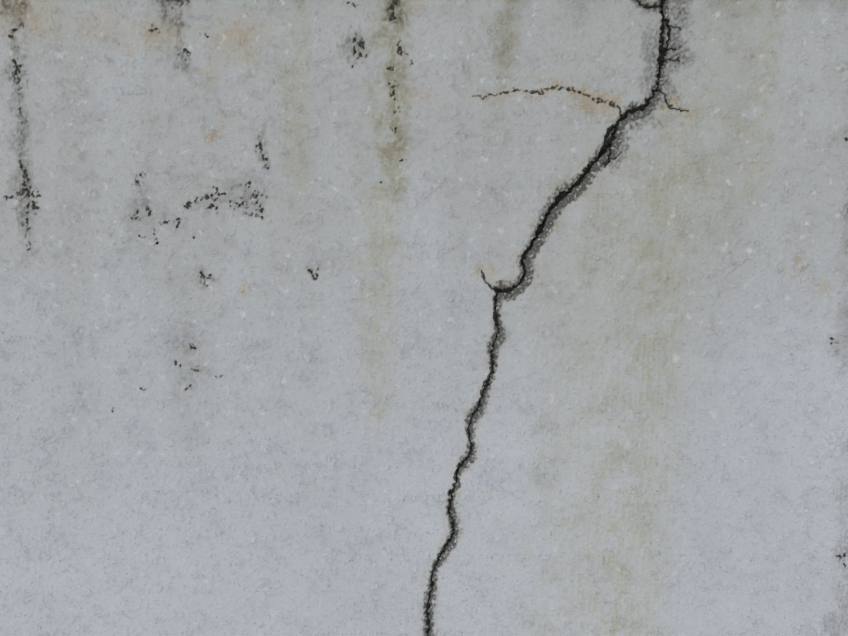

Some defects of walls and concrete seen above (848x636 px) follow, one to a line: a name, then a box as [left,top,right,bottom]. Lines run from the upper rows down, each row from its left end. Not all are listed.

crack [424,0,688,636]